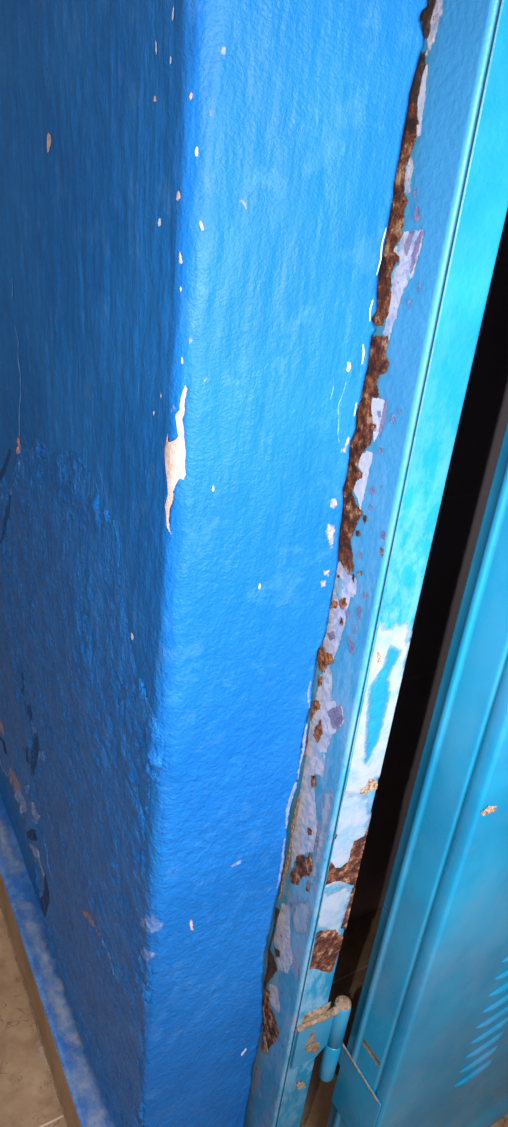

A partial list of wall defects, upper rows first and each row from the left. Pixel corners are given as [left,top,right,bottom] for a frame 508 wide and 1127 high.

rust [420,0,436,38]
peeling [417,0,456,137]
rust [337,52,425,578]
peeling [377,157,424,340]
spalling [165,385,187,532]
peeling [353,398,401,524]
rust [330,597,347,609]
rust [304,645,333,757]
peeling [274,561,411,973]
rust [261,797,313,1054]
rust [309,826,369,973]
peeling [18,903,109,1127]